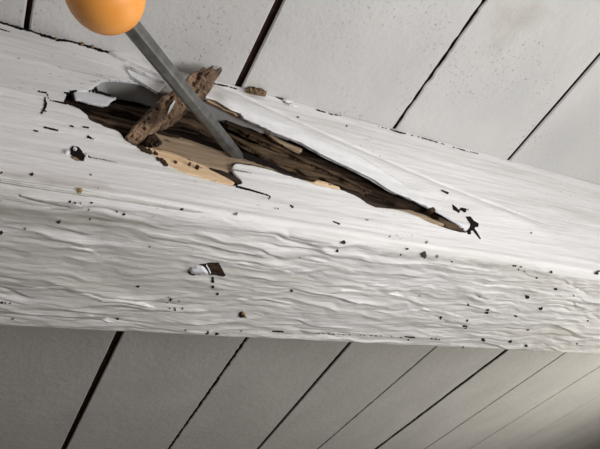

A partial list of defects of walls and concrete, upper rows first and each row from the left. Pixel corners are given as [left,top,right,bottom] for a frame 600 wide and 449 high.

spalling [50,50,167,138]
peeling [65,146,117,163]
spalling [132,87,481,239]
crack [232,169,294,209]
peeling [188,262,226,277]